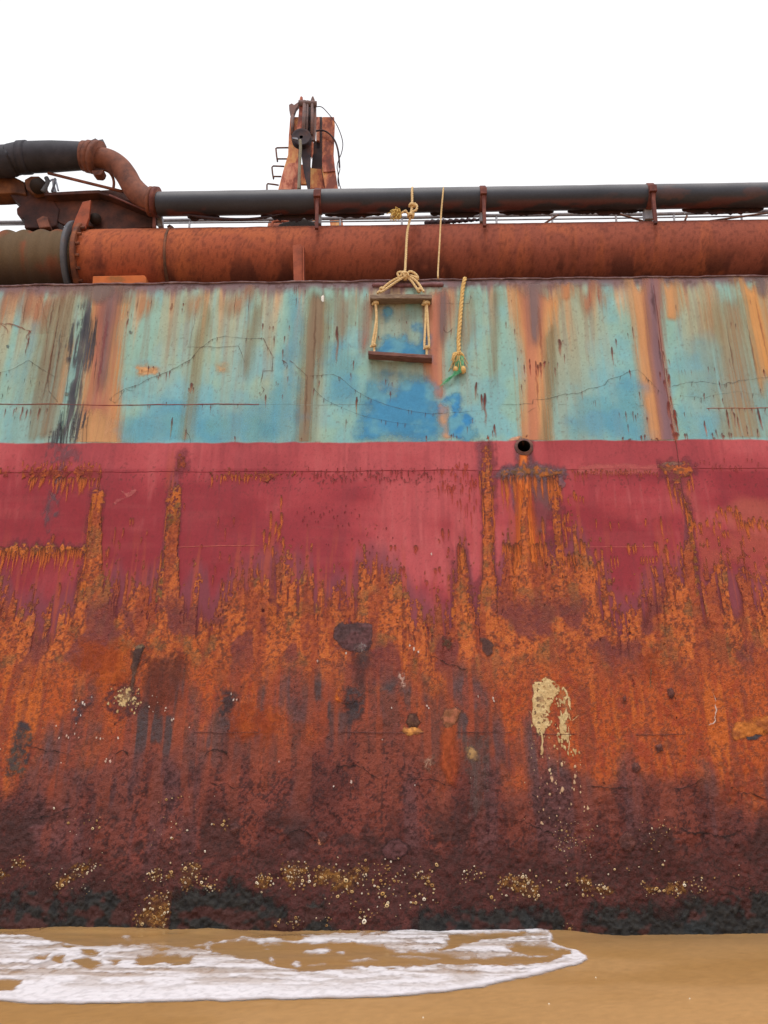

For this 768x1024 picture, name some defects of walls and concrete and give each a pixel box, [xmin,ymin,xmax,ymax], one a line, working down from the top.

corrosion [1,286,150,442]
corrosion [137,366,170,376]
corrosion [296,293,345,442]
corrosion [423,291,473,438]
corrosion [511,284,574,440]
corrosion [611,278,692,441]
corrosion [704,277,768,438]
corrosion [0,424,768,932]
peeling [531,687,589,824]